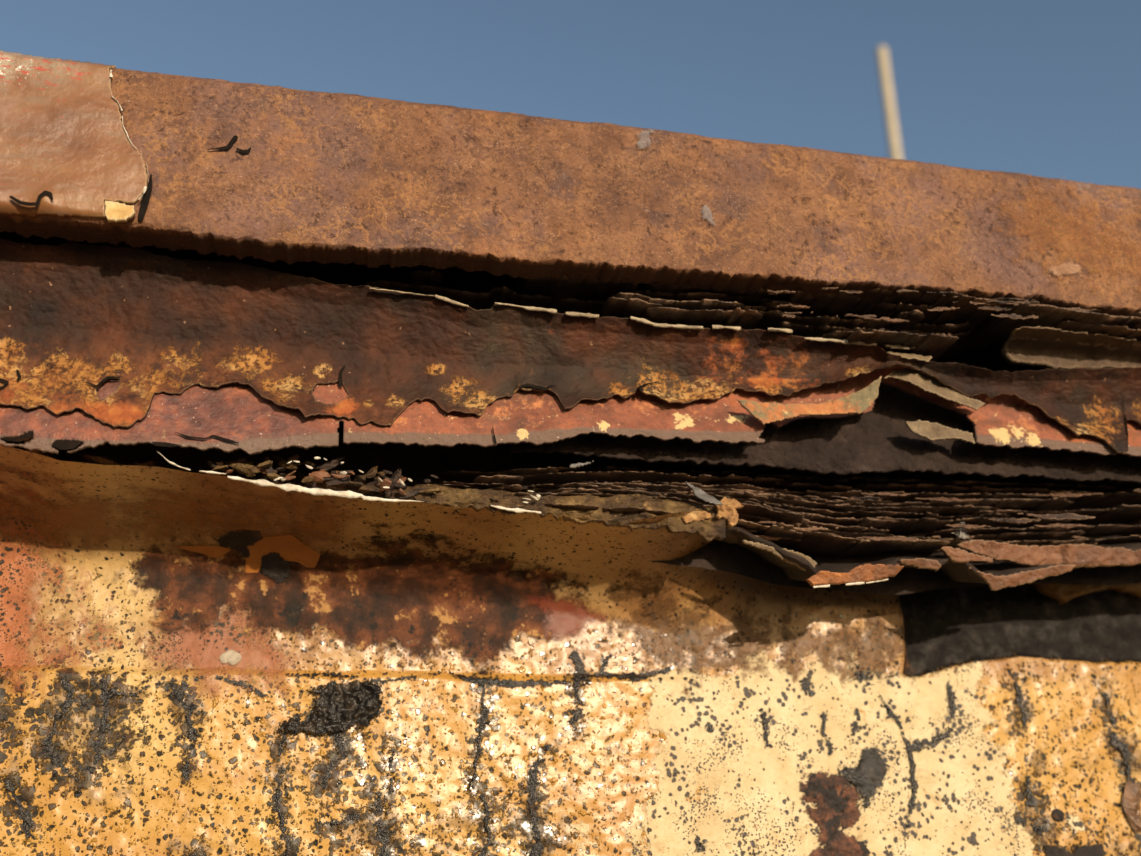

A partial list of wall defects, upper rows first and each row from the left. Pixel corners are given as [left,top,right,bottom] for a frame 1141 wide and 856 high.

crack [138,174,152,221]
spalling [1047,262,1080,276]
peeling [366,270,1141,362]
peeling [156,450,424,502]
peeling [435,461,1141,557]
peeling [245,535,320,573]
peeling [623,583,1141,856]
peeling [571,821,599,850]
corrosion [796,772,871,856]